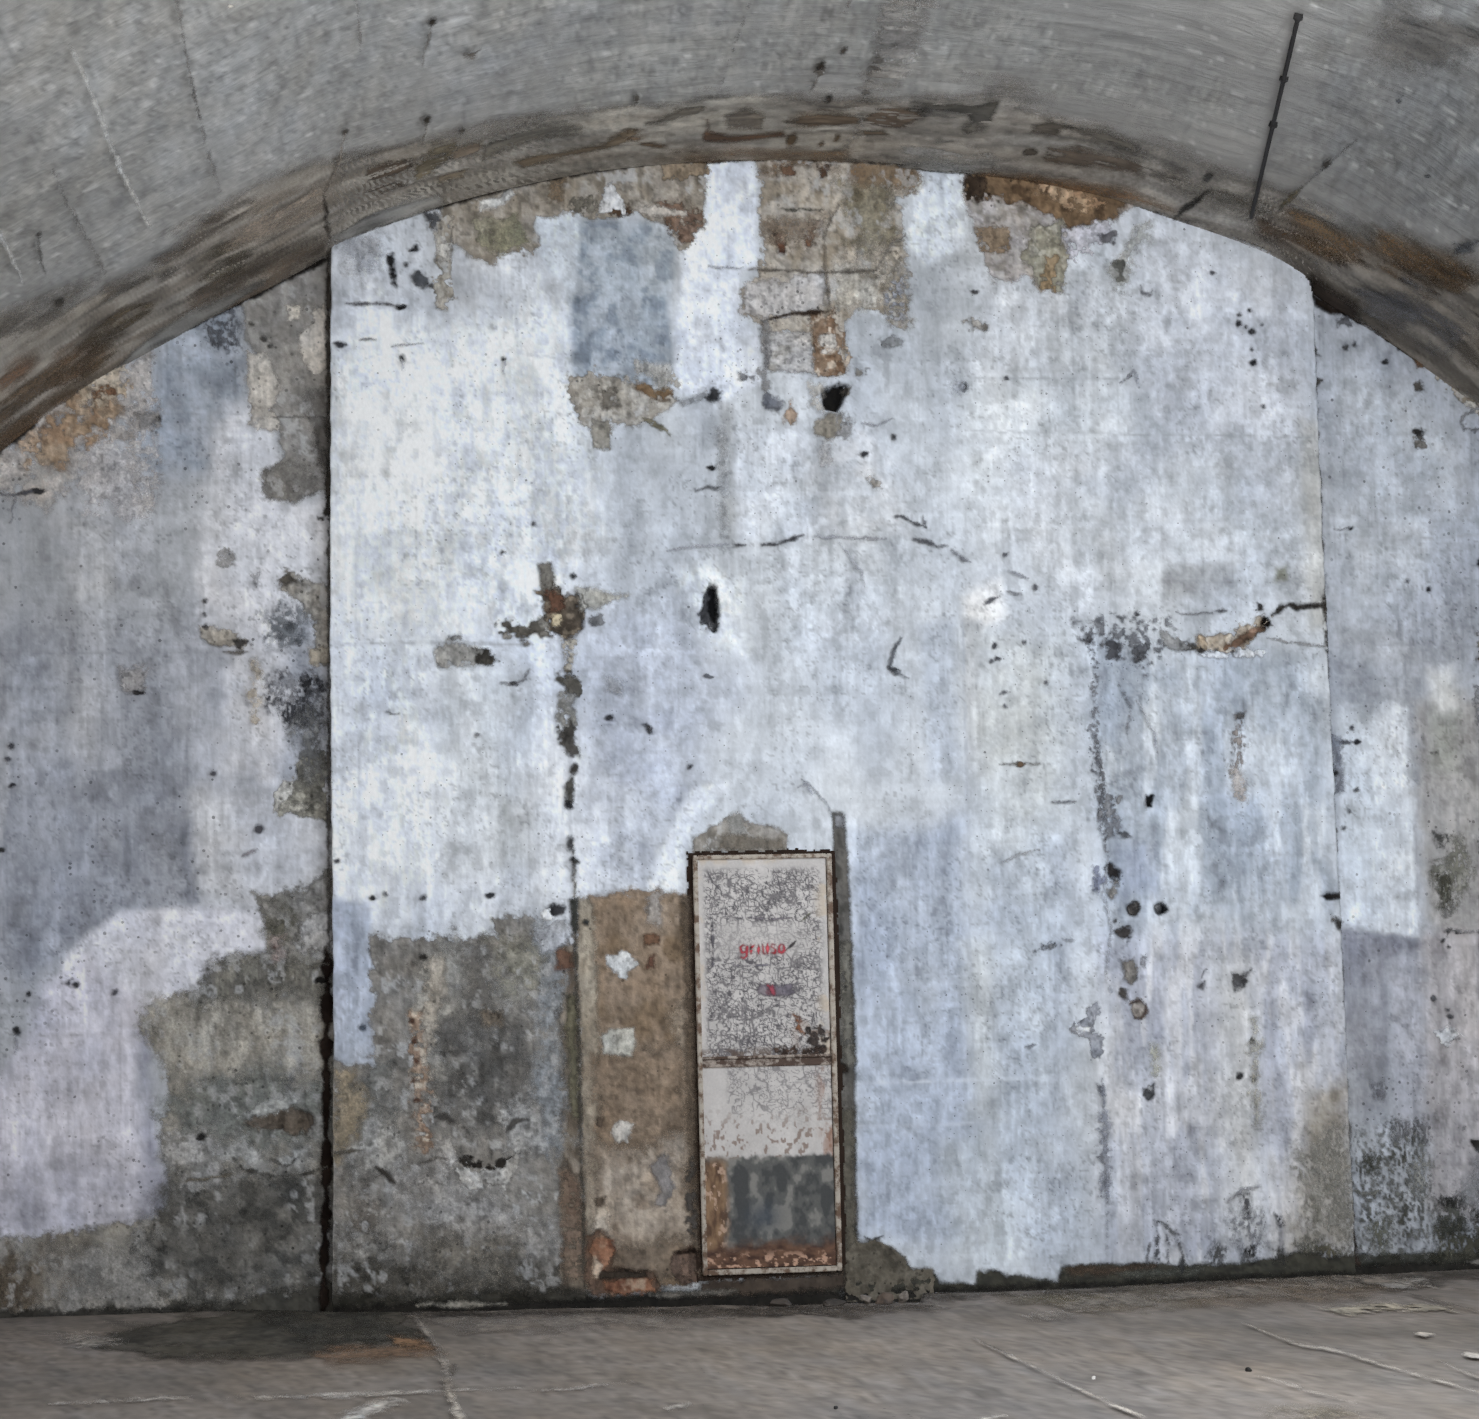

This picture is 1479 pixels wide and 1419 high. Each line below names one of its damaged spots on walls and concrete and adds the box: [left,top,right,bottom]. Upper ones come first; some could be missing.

peeling [242,255,331,503]
peeling [345,162,710,310]
peeling [567,359,721,450]
peeling [738,159,922,411]
peeling [963,171,1135,293]
crack [1312,293,1414,501]
spalling [435,635,500,668]
spalling [494,562,628,802]
crack [1183,587,1361,851]
peeling [0,868,701,1315]
water stain [0,1118,1479,1363]
crack [1340,1124,1356,1281]